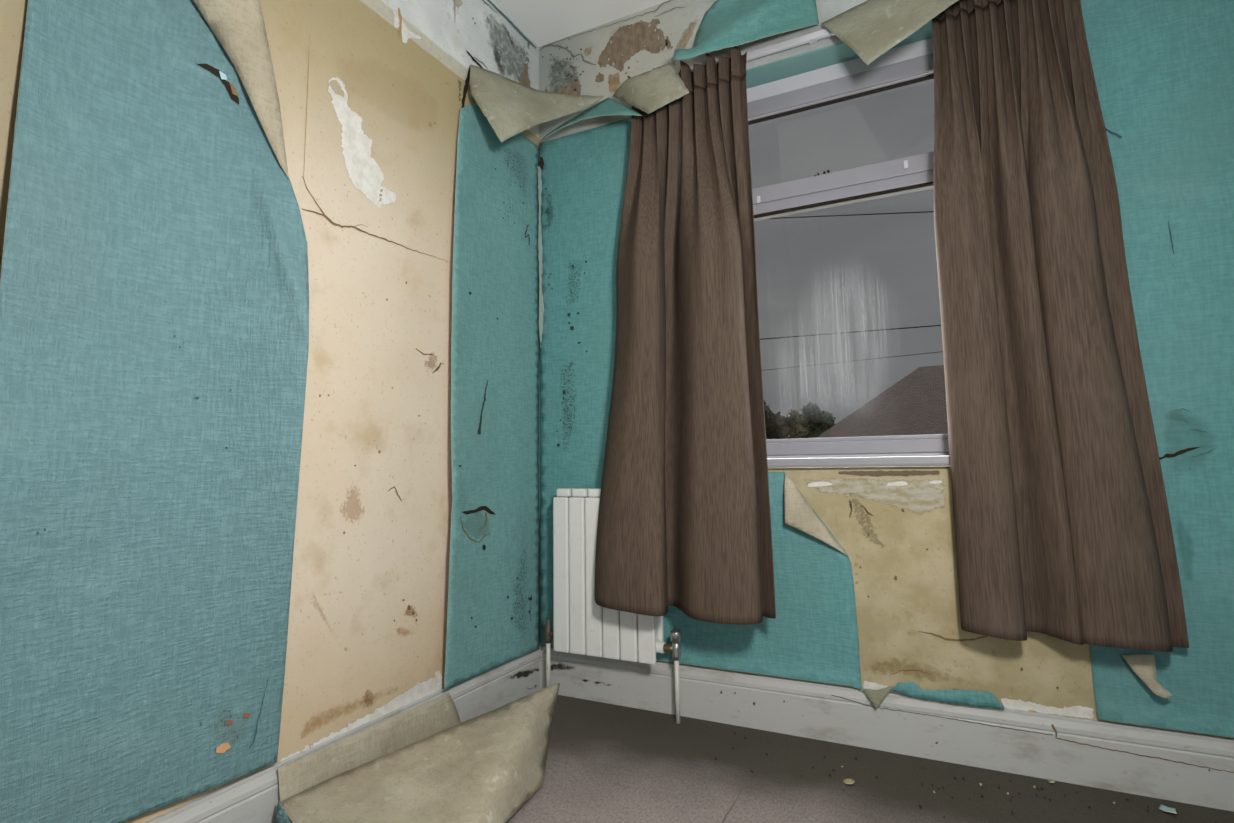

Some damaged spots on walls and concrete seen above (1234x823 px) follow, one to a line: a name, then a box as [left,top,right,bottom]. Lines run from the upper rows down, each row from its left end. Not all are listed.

water stain [487,18,525,82]
flaking render [556,19,673,95]
peeling [328,77,397,207]
crack [302,34,446,261]
flaking render [280,671,443,762]
flaking render [863,681,888,690]
flaking render [1001,698,1094,719]